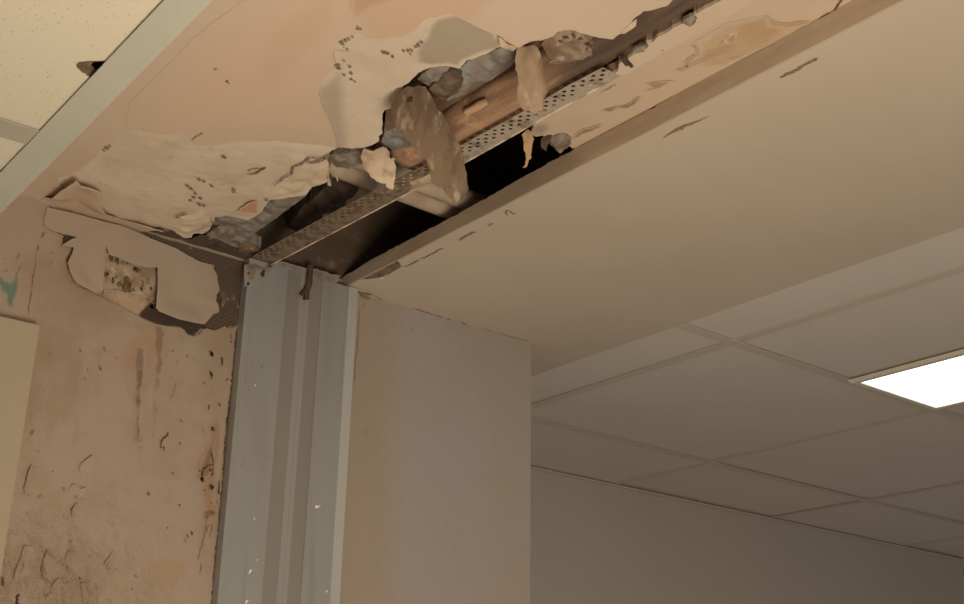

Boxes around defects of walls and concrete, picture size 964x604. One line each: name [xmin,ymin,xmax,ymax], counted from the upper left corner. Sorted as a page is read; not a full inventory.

spalling [541,30,595,64]
peeling [620,19,637,34]
water stain [677,0,851,73]
peeling [40,17,524,337]
water stain [108,325,164,385]